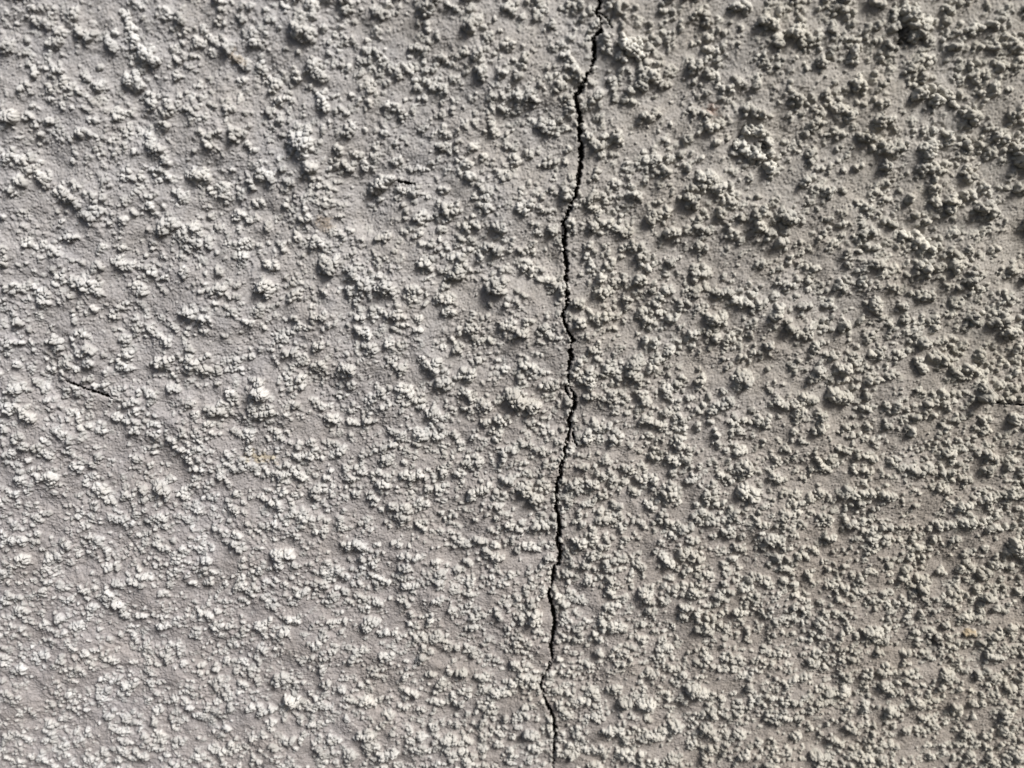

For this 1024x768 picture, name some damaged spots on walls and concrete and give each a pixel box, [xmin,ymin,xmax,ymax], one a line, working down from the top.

crack [539,0,611,768]